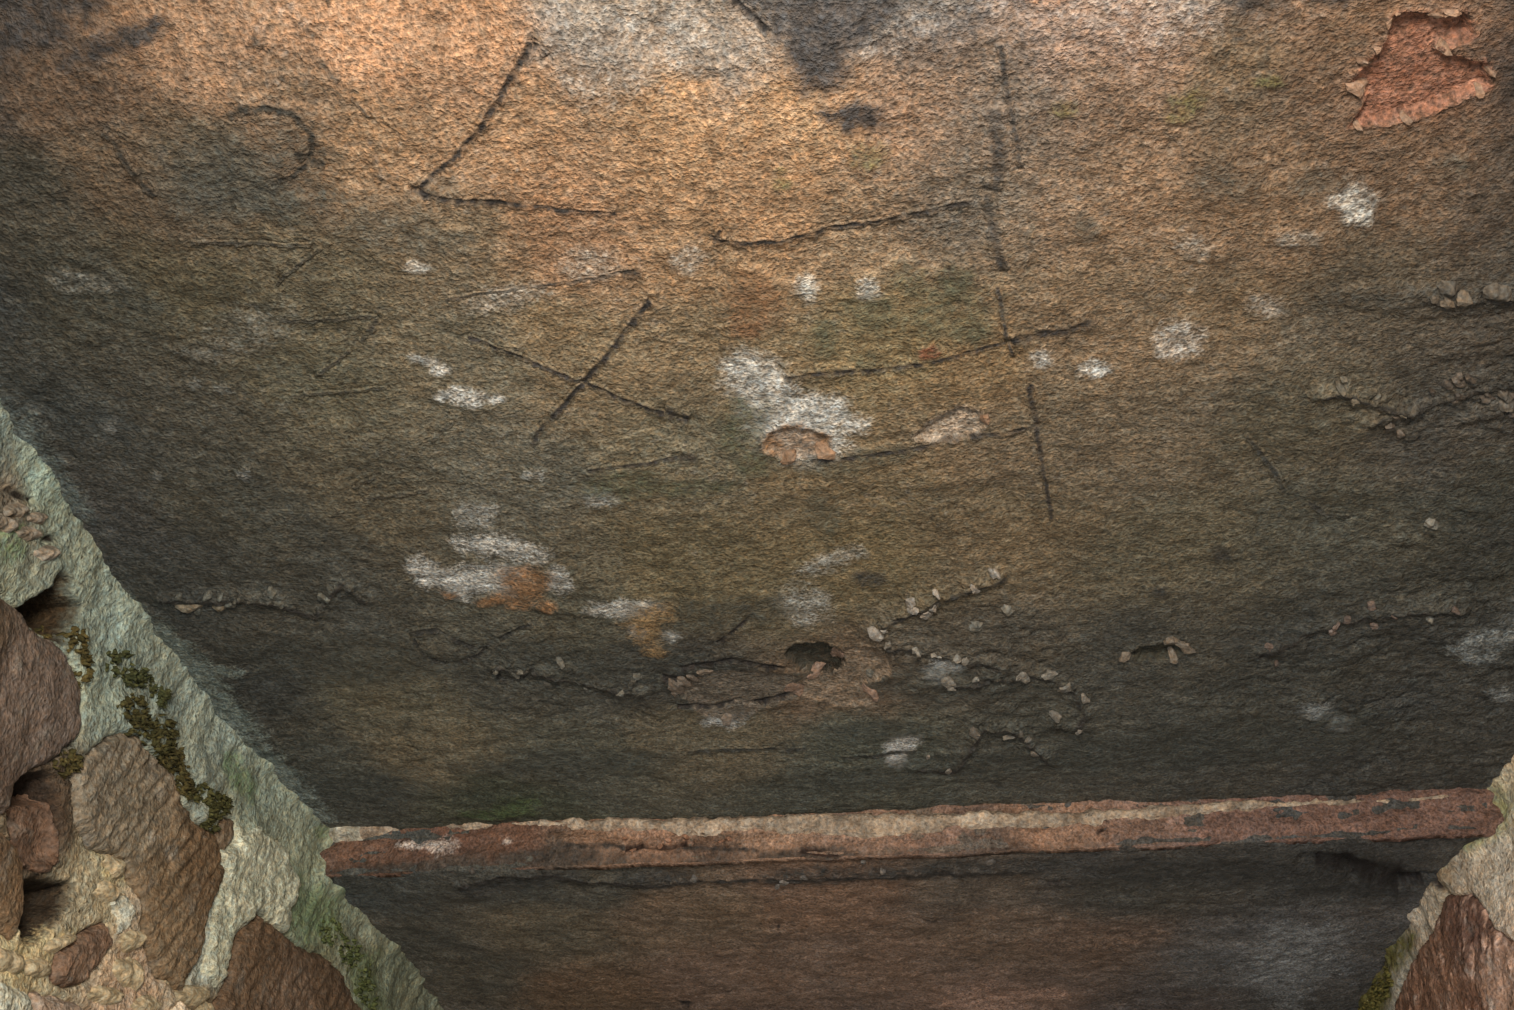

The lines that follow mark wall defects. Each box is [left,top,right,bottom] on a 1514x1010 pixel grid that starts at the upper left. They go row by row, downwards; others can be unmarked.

damp [0,0,362,84]
damp [406,0,1005,143]
damp [1038,0,1239,62]
damp [1142,309,1217,370]
damp [102,337,1443,828]
spalling [667,568,1090,735]
damp [325,825,1447,1010]